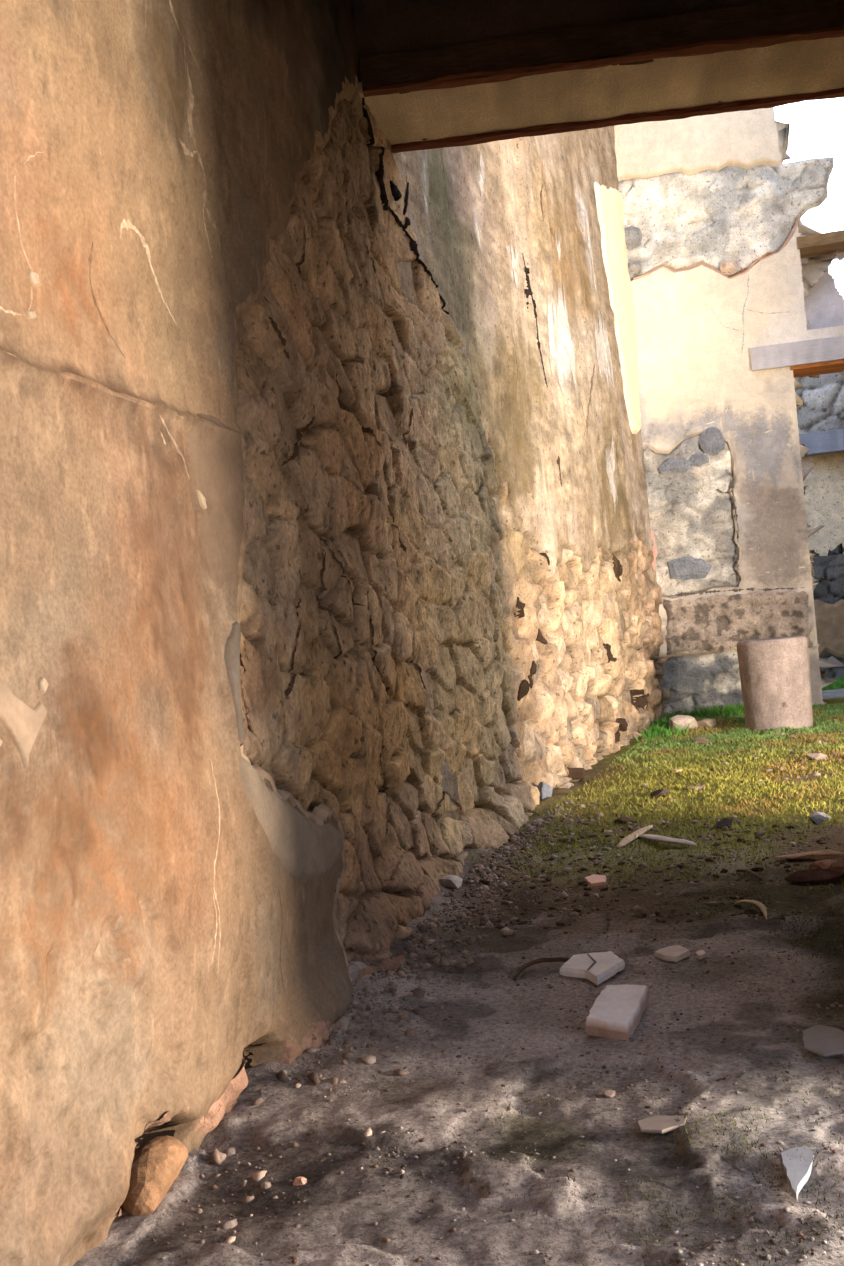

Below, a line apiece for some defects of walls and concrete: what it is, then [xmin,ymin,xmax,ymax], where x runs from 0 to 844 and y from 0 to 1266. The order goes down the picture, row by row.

crack [362,98,449,315]
flaking render [618,157,834,281]
crack [522,253,548,387]
crack [160,415,190,478]
flaking render [134,75,743,1151]